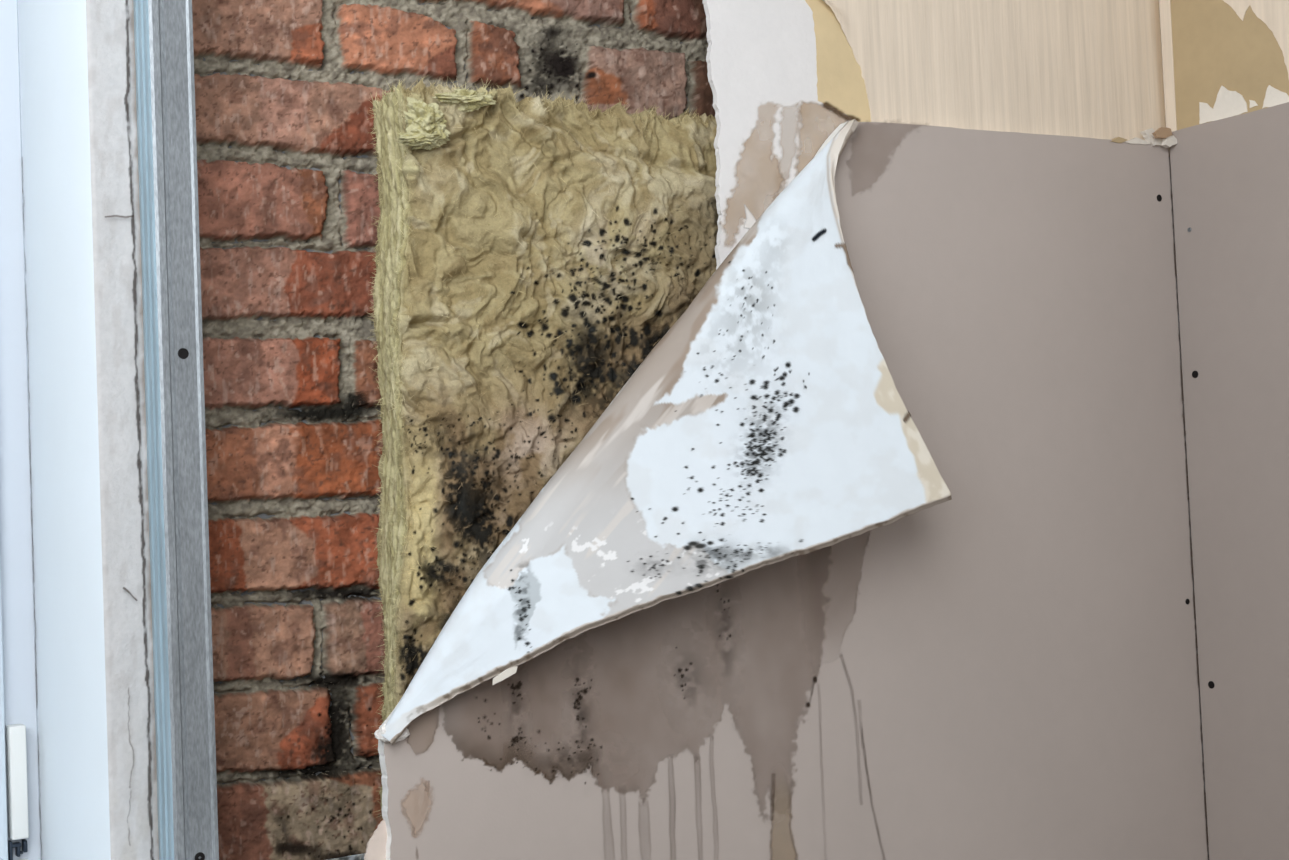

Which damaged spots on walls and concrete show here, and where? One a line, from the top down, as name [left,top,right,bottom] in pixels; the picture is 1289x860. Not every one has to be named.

peeling [1110,0,1289,148]
water stain [399,102,859,680]
peeling [492,666,518,685]
spalling [374,723,410,743]
water stain [453,678,602,786]
water stain [770,806,797,860]